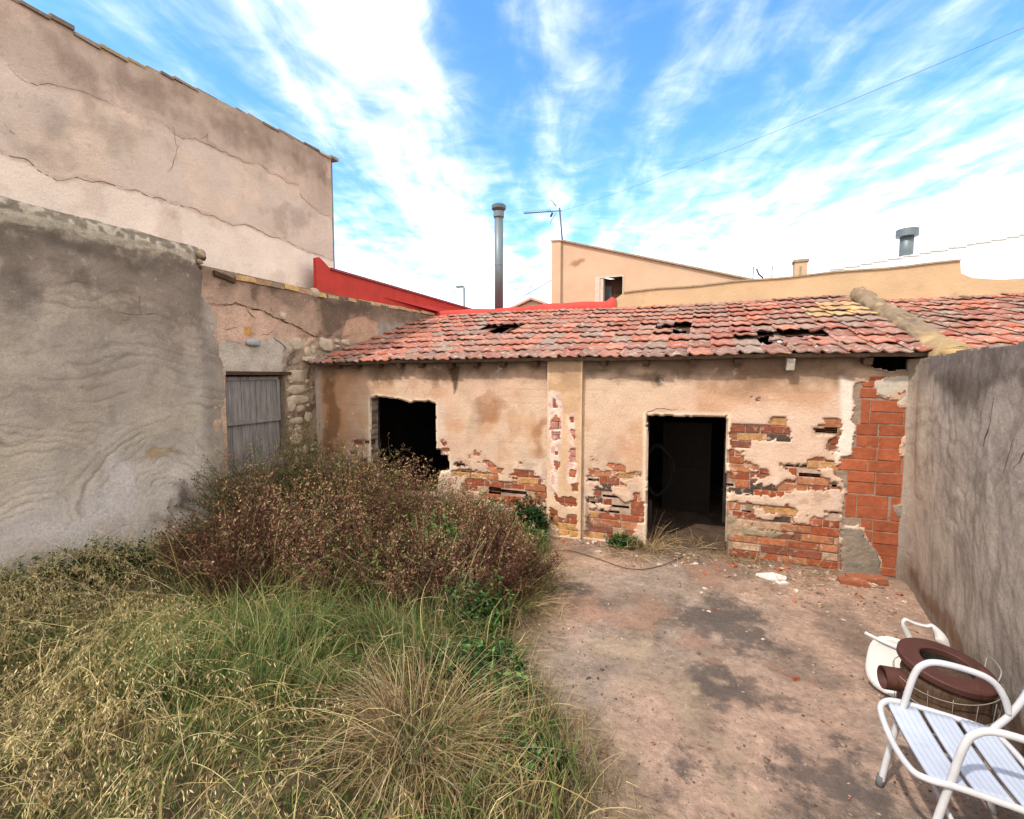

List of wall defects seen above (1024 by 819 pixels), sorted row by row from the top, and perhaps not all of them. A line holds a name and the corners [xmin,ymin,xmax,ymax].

crack [1,131,319,255]
crack [222,302,318,349]
spalling [444,399,645,539]
spalling [726,418,843,569]